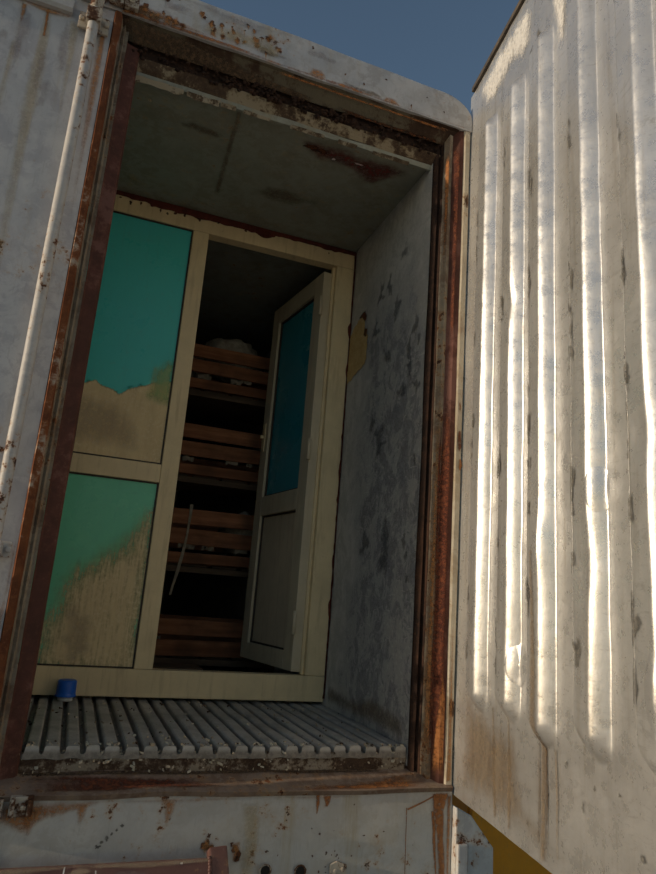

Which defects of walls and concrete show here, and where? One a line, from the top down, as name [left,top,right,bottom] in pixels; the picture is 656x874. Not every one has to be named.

corrosion [87,36,104,121]
peeling [135,75,271,122]
corrosion [123,1,444,131]
peeling [347,312,368,384]
peeling [73,366,173,464]
peeling [38,513,155,669]
corrosion [424,416,450,769]
corrosion [432,793,451,874]